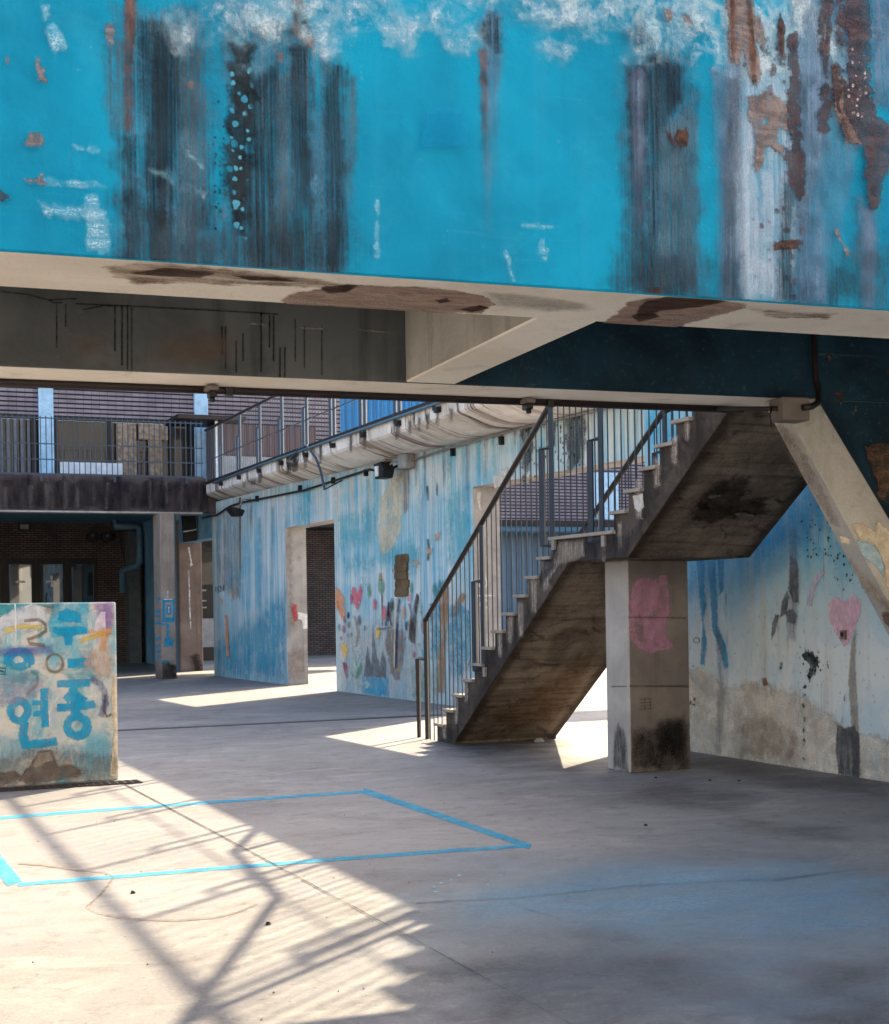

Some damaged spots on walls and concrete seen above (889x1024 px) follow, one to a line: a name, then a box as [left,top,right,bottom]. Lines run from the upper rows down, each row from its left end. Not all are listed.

peeling [246,0,332,57]
peeling [630,0,707,52]
damp [108,0,355,273]
damp [617,53,701,296]
peeling [718,0,889,299]
damp [690,476,770,523]
damp [614,720,688,771]